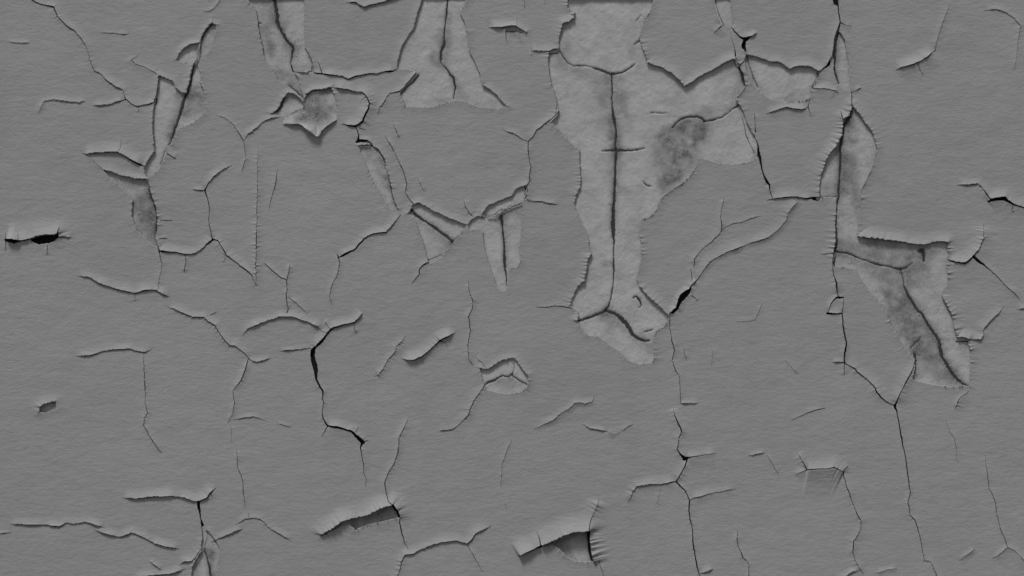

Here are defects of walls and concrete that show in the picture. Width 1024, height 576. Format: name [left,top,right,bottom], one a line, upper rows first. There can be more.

peeling [2,224,29,252]
peeling [33,395,62,418]
crack [30,0,158,113]
peeling [100,19,222,249]
crack [10,48,491,576]
peeling [311,491,411,542]
peeling [243,0,532,291]
crack [490,0,559,54]
crack [625,0,862,576]
peeling [542,0,978,389]
crack [822,251,940,576]
crack [950,225,1020,343]